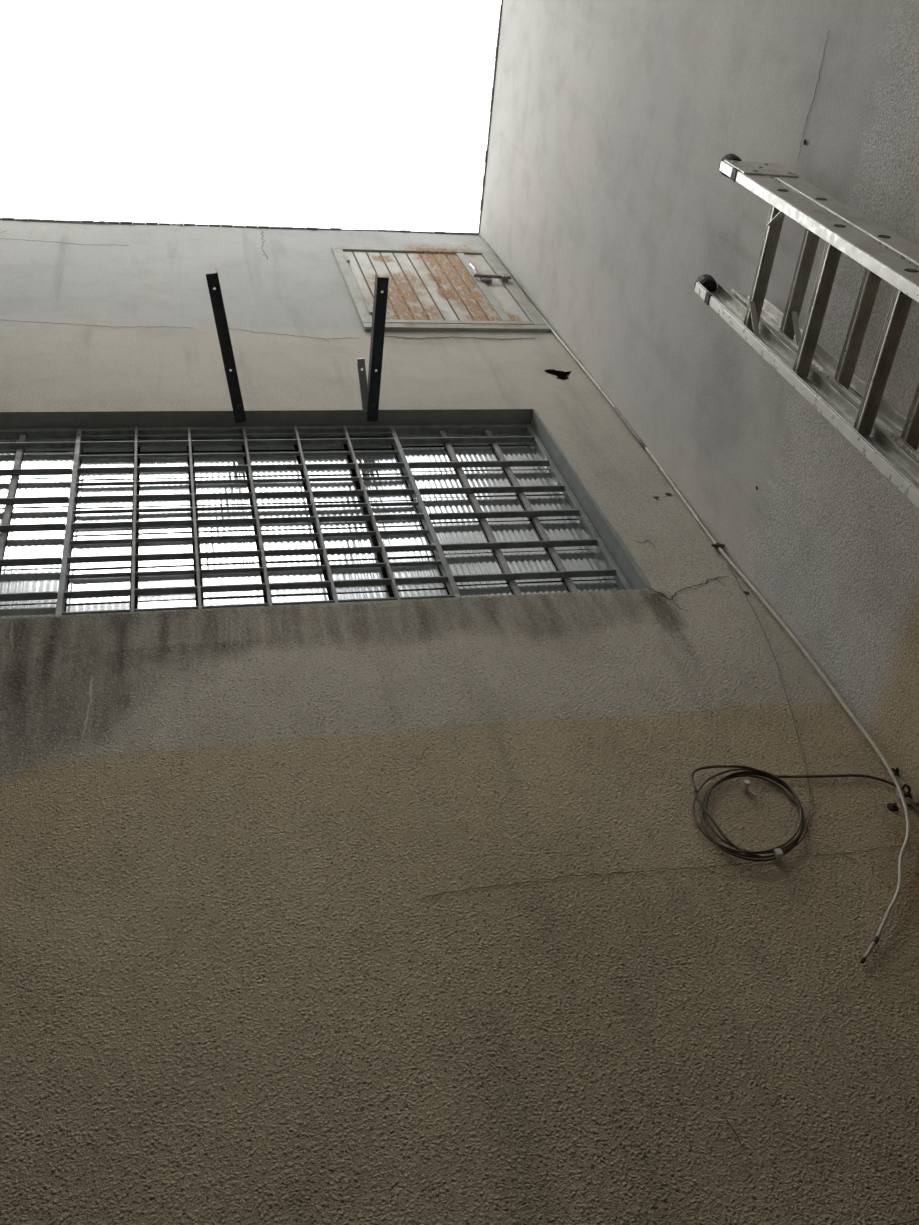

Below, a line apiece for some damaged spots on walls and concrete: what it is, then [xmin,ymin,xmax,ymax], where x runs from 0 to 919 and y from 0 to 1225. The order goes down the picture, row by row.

crack [798,30,830,158]
corrosion [374,245,518,325]
crack [648,575,729,611]
crack [418,842,918,900]